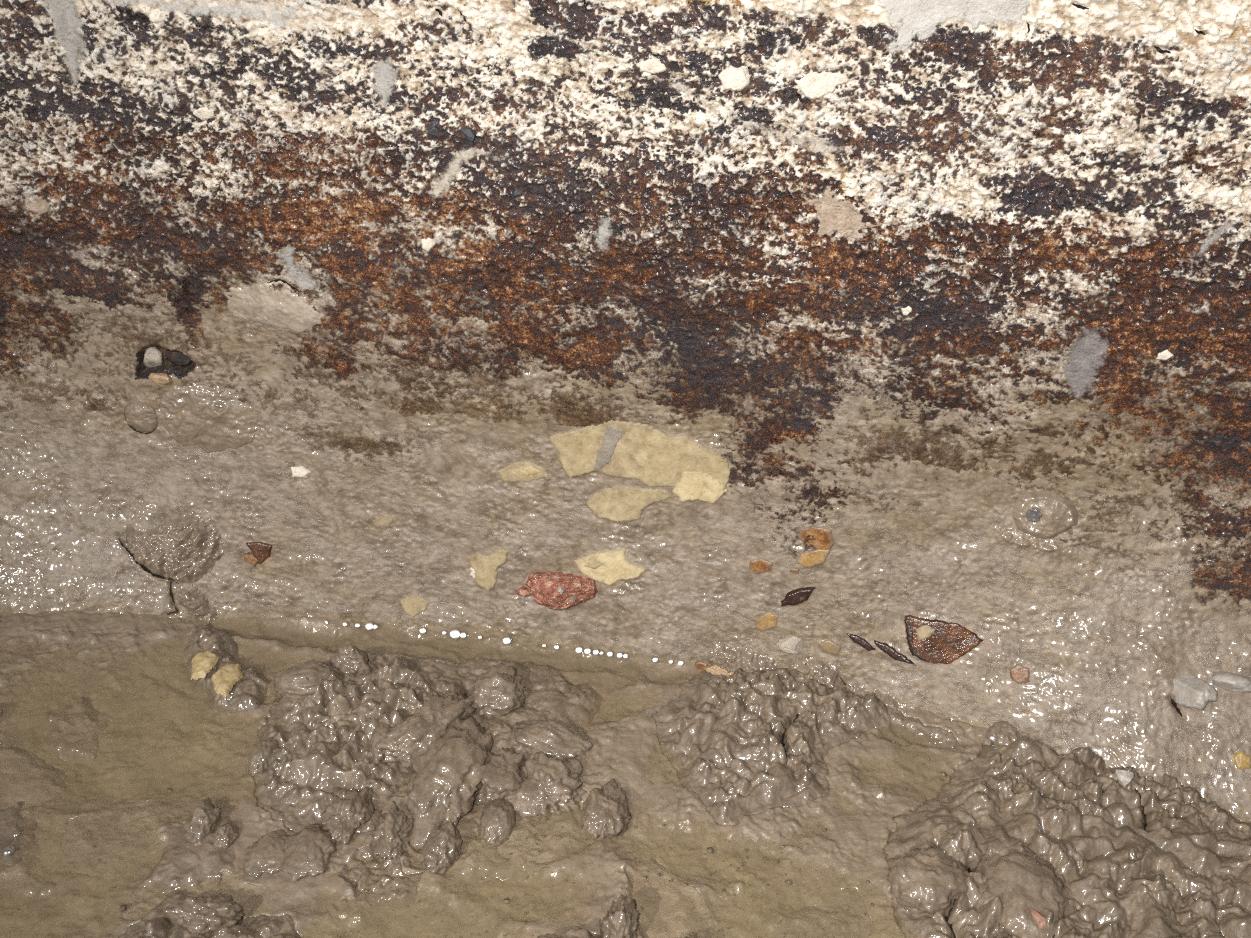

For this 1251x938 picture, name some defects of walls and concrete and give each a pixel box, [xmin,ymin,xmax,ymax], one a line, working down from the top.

rust [0,81,1251,630]